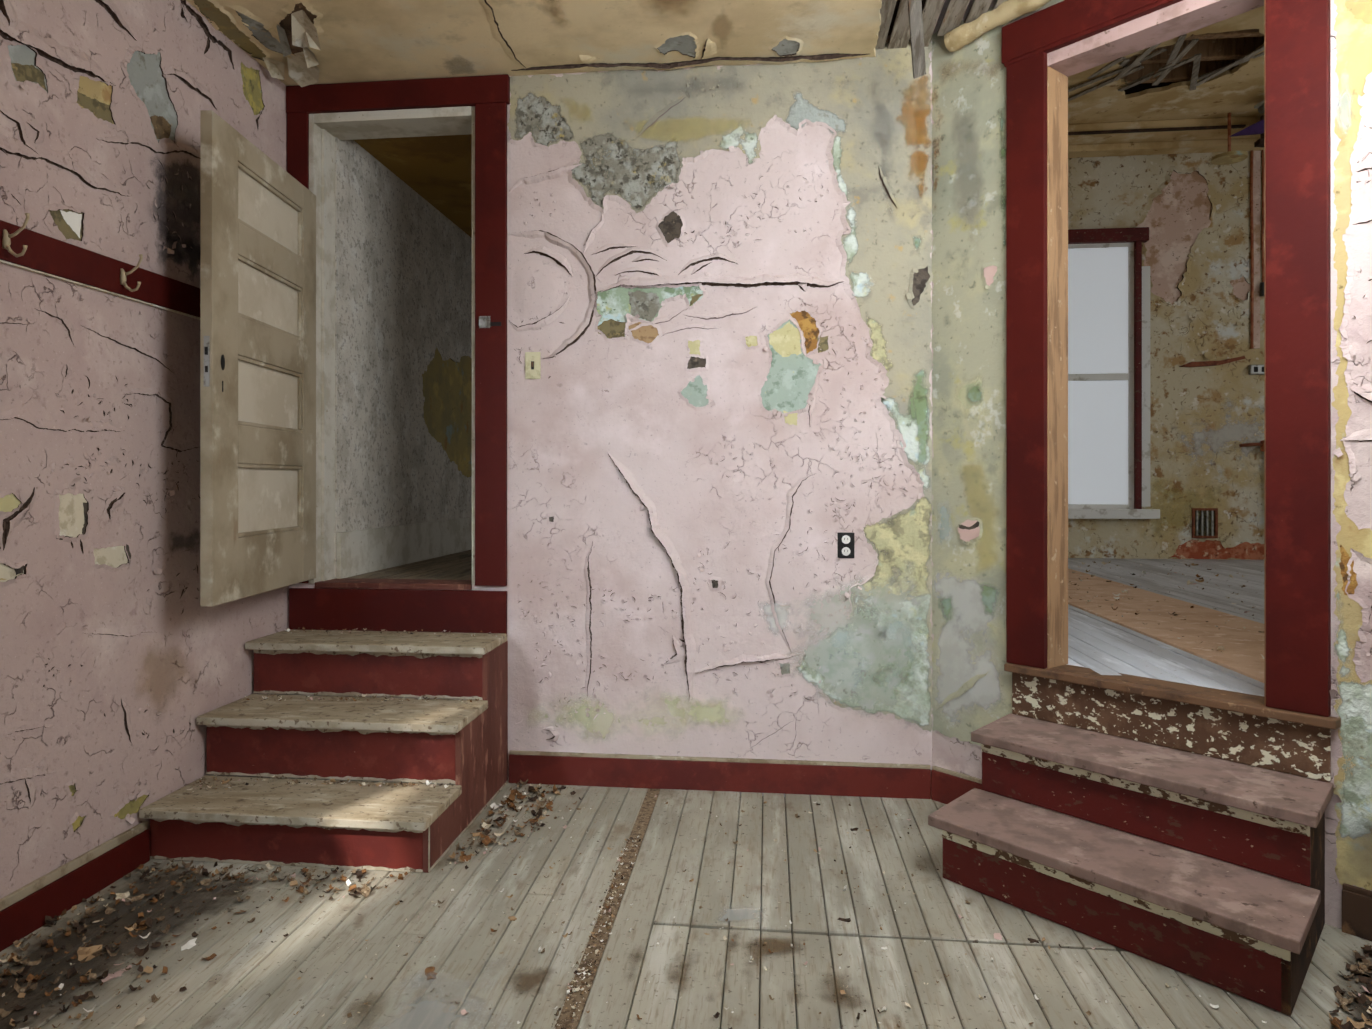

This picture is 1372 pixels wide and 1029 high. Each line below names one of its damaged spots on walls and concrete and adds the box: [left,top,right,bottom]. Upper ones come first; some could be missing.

crack [0,0,116,86]
crack [164,0,235,110]
peeling [190,0,324,118]
crack [478,0,870,138]
peeling [42,203,85,246]
crack [0,107,200,196]
peeling [71,46,200,269]
leakage [154,164,200,274]
crack [507,212,845,359]
peeling [1130,166,1217,310]
peeling [507,0,1064,750]
crack [608,453,816,702]